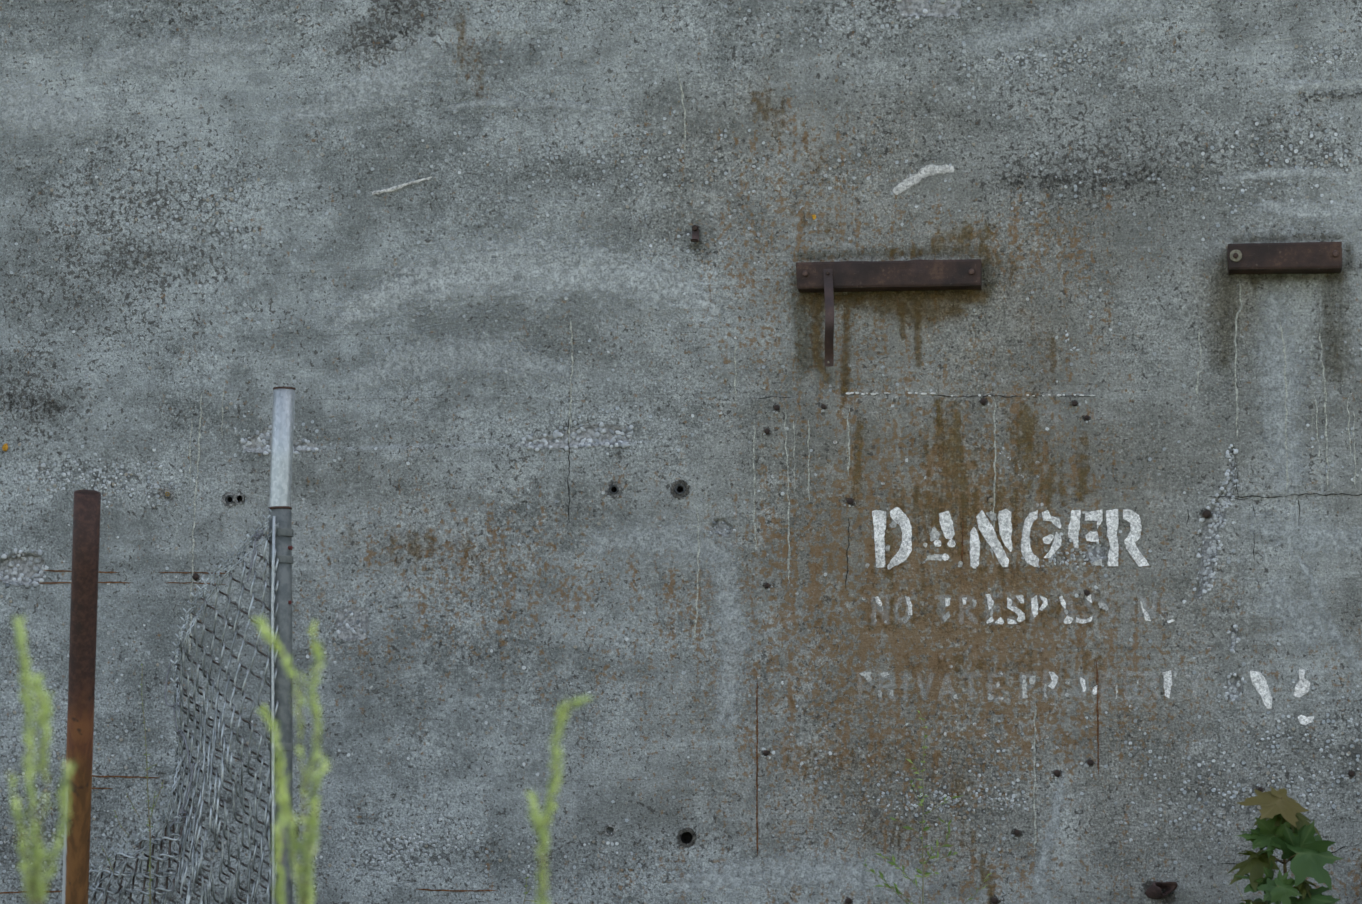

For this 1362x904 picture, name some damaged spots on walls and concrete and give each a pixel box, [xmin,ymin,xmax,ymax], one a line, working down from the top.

rust [890,221,1016,283]
rust [803,290,987,408]
water stain [1220,254,1282,439]
spalling [0,548,49,588]
rust [390,532,486,575]
rust [868,382,1091,633]
spalling [1192,444,1239,599]
rust [1062,653,1102,774]